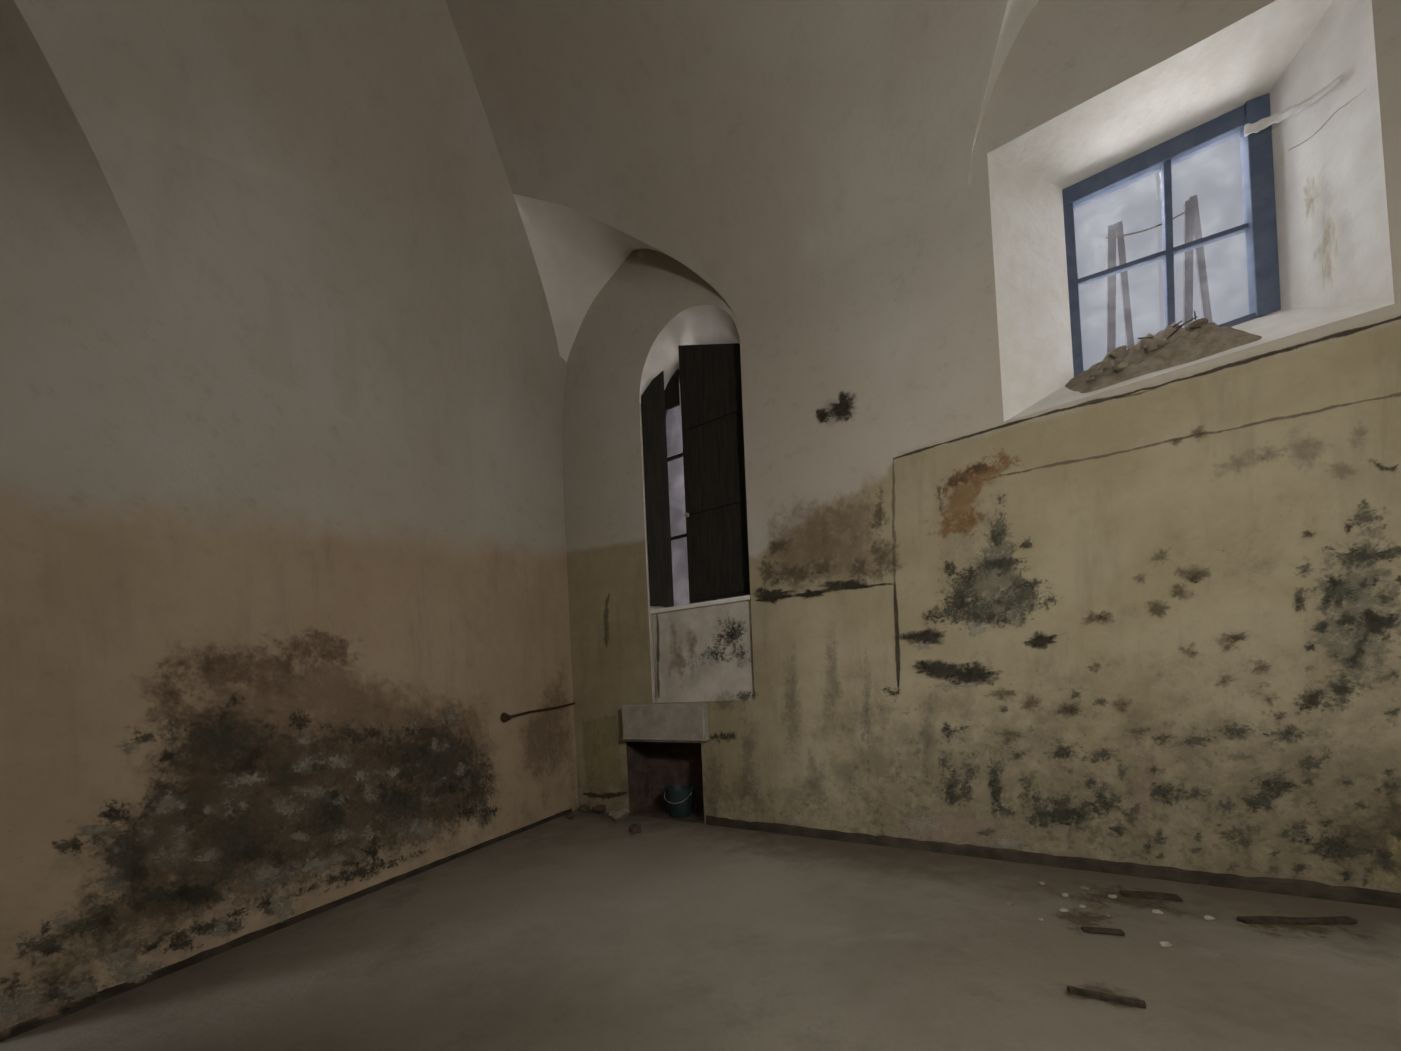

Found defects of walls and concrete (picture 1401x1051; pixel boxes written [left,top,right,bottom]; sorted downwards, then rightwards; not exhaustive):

leakage [921,495,1056,636]
crack [755,316,1401,696]
leakage [701,620,746,663]
leakage [0,696,500,1026]
leakage [941,722,1330,846]
leakage [1155,713,1302,747]
leakage [1273,769,1401,885]